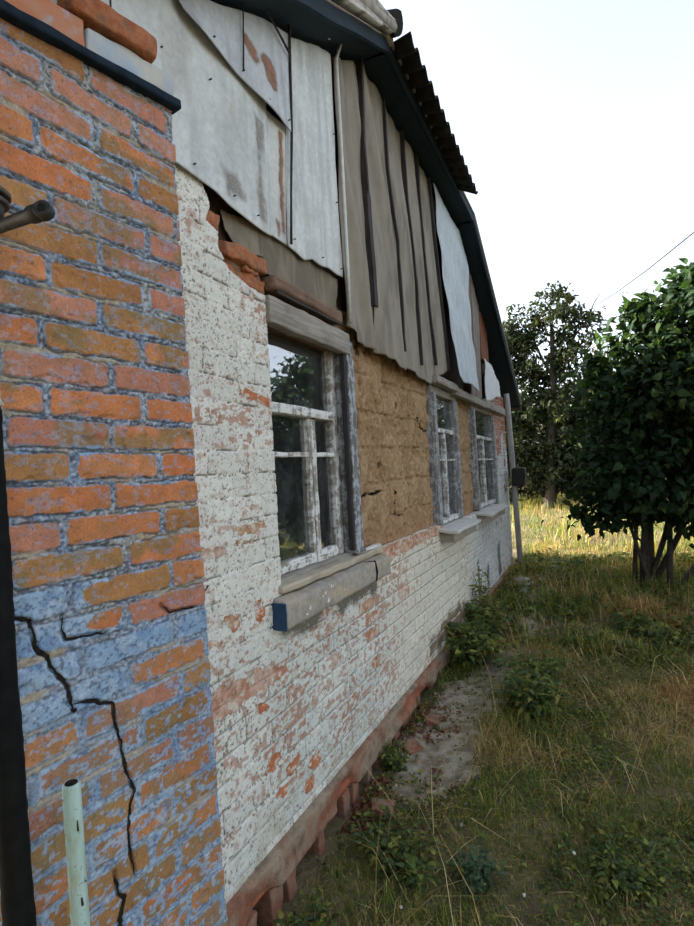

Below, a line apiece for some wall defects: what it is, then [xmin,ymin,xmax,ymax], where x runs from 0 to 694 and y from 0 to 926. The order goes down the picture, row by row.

rust [244,33,277,90]
spalling [206,210,267,295]
peeling [239,384,269,407]
peeling [202,546,226,559]
peeling [232,520,266,546]
peeling [218,614,241,633]
peeling [255,595,267,622]
peeling [358,596,380,643]
peeling [211,661,287,722]
crack [14,615,136,926]
peeling [265,751,321,800]